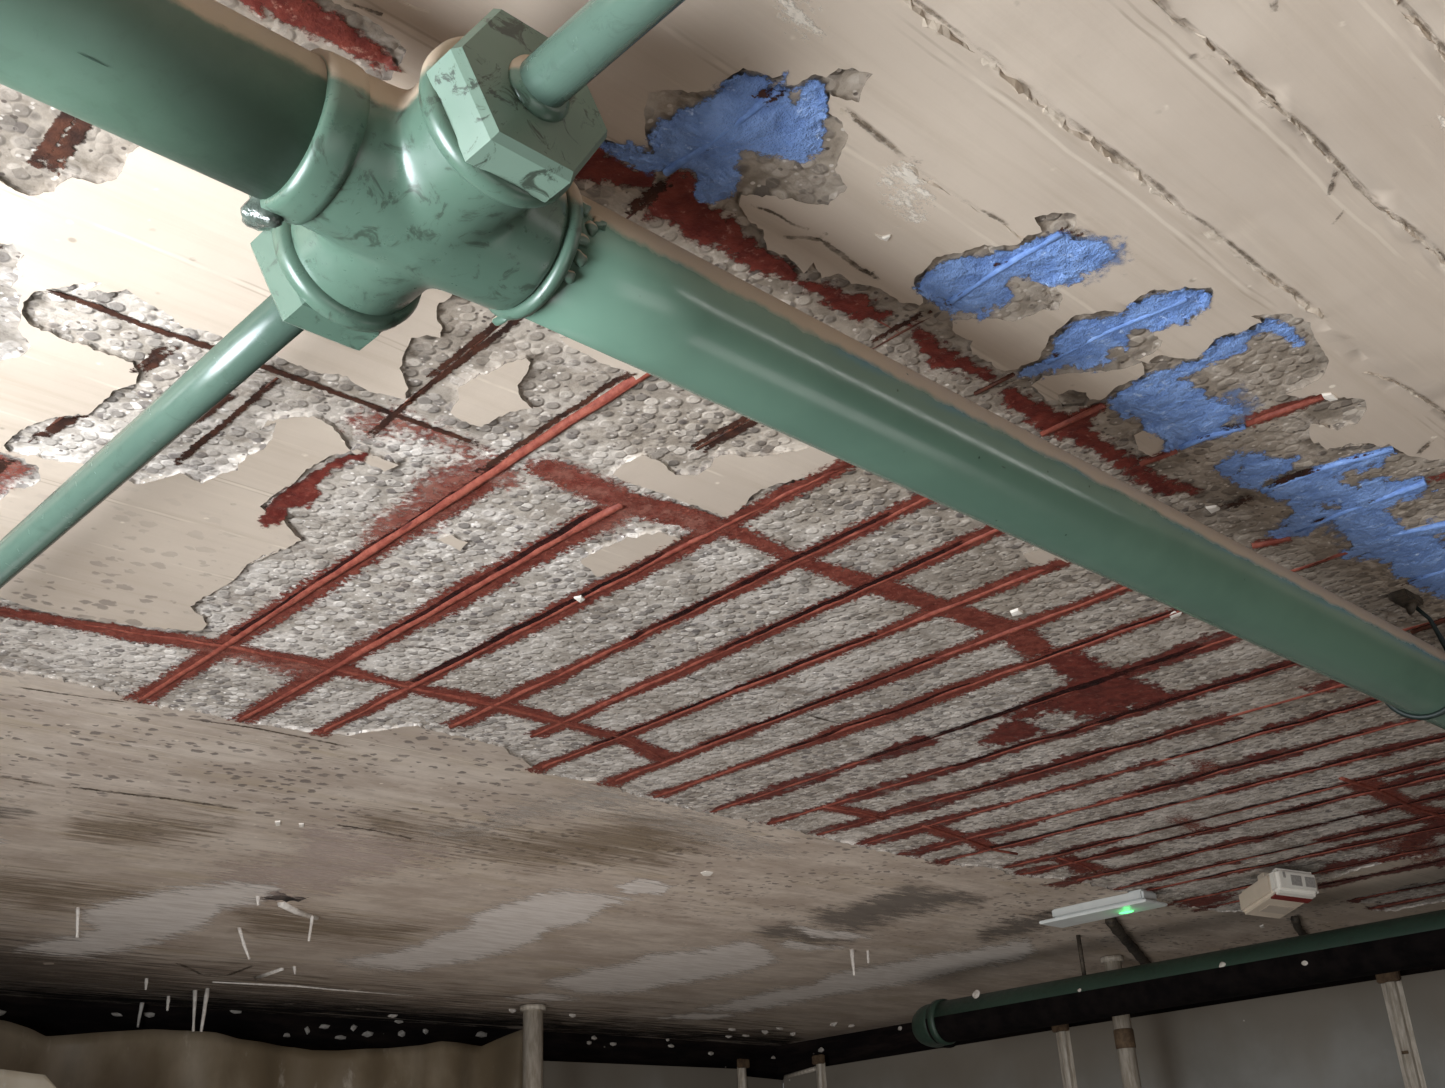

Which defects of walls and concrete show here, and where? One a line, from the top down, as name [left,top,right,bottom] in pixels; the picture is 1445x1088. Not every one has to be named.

spalling [0,84,139,196]
spalling [0,243,223,500]
corrosion [46,289,215,377]
corrosion [174,319,522,466]
corrosion [472,371,636,473]
corrosion [686,416,758,453]
spalling [573,68,1445,652]
spalling [0,294,1445,912]
damp [78,816,220,840]
damp [216,783,786,939]
damp [758,886,983,946]
damp [978,912,1053,942]